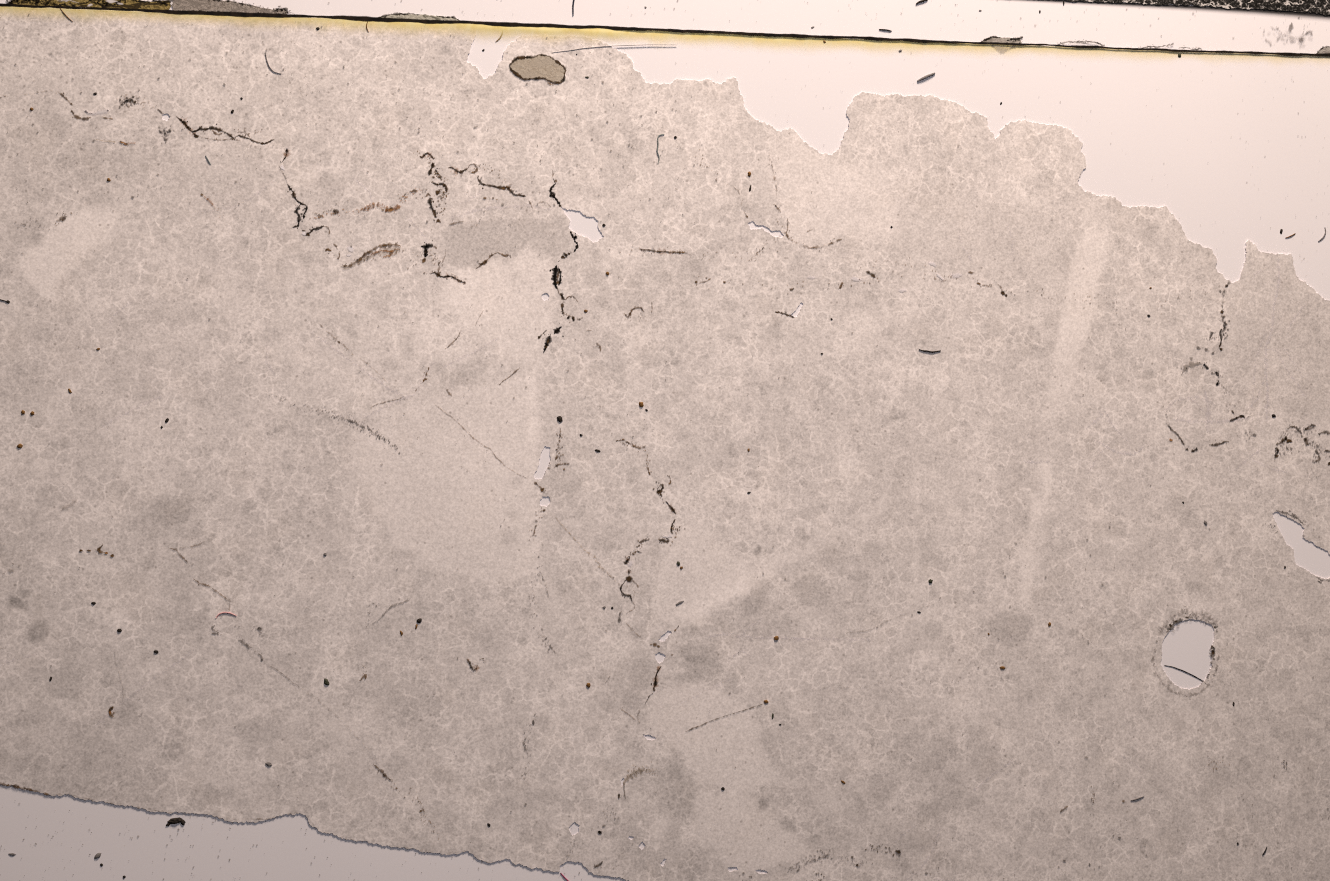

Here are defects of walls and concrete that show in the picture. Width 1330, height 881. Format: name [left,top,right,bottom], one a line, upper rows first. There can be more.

crack [176,116,353,259]
crack [417,151,601,385]
crack [641,248,726,283]
crack [1167,283,1256,452]
crack [595,439,680,622]
crack [605,625,679,714]